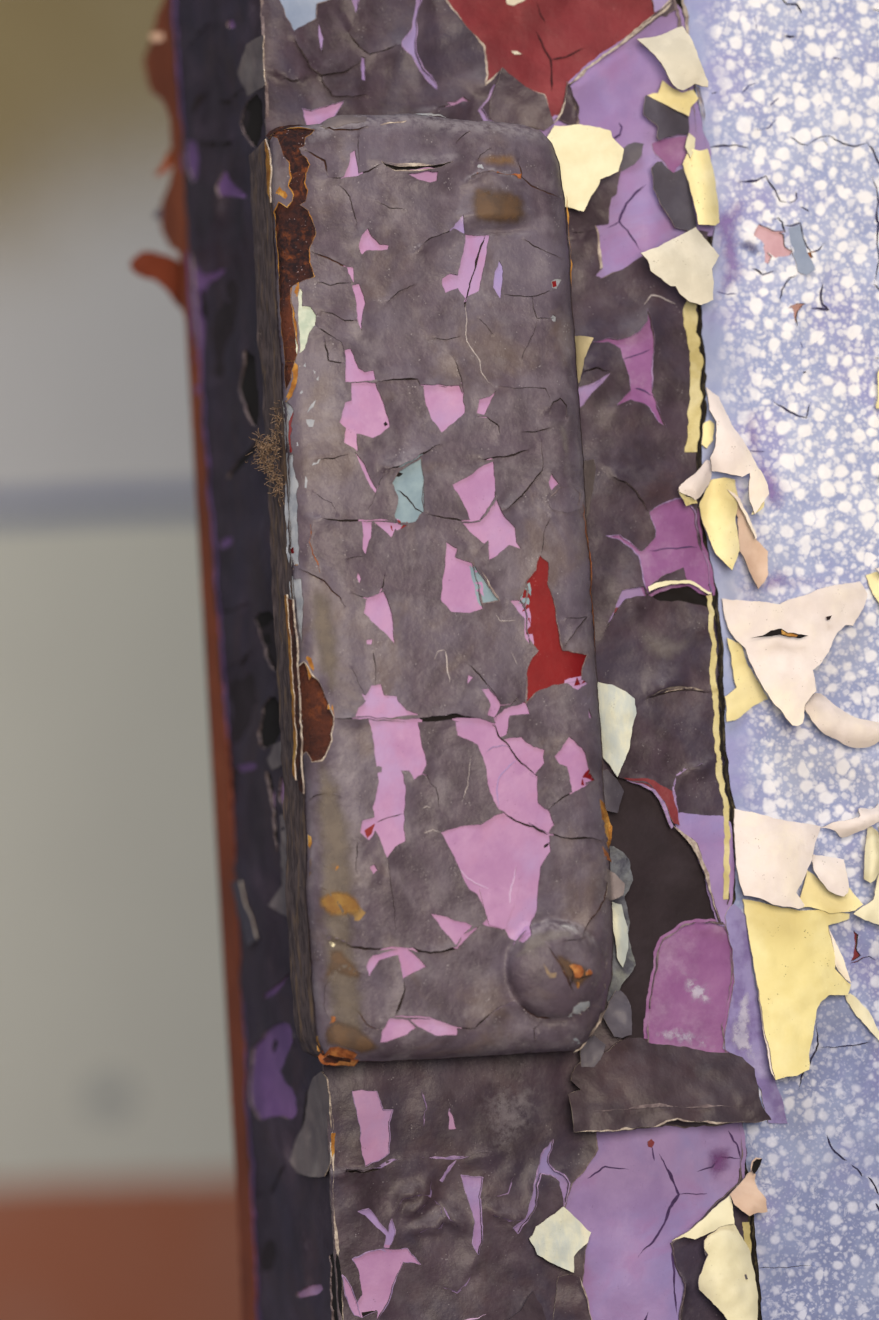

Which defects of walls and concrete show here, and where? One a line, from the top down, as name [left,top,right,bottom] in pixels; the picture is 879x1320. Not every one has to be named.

peeling [280,0,328,50]
crack [673,0,689,34]
peeling [446,0,719,425]
crack [688,83,879,271]
crack [683,176,829,548]
peeling [606,387,879,748]
crack [649,584,735,904]
peeling [507,682,879,1320]
peeling [297,1208,421,1320]
peeling [352,1090,393,1167]
crack [742,1215,804,1320]
crack [827,1138,879,1211]